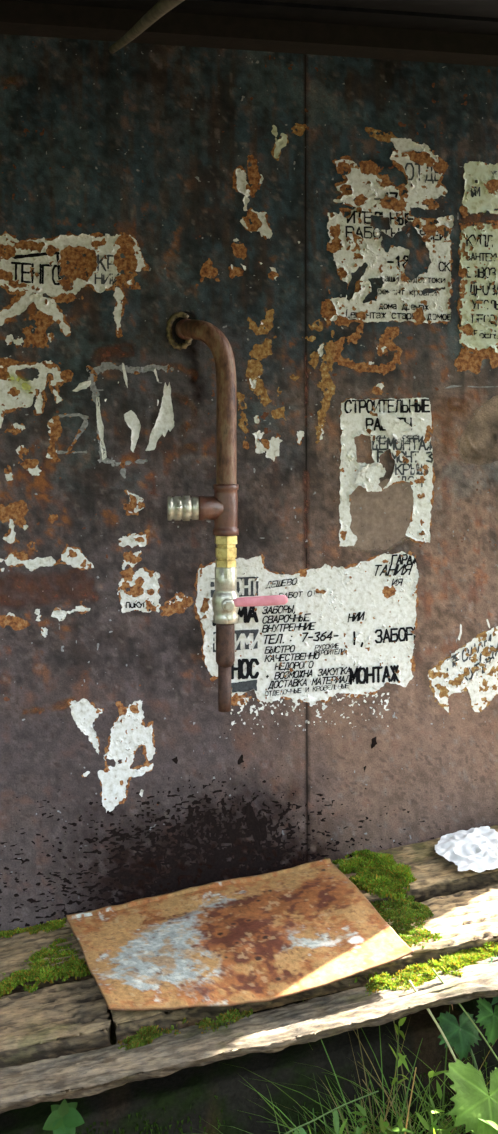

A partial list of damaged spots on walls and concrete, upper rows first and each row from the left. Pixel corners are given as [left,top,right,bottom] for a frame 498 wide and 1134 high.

corrosion [365,113,426,153]
corrosion [5,310,54,348]
peeling [73,362,187,406]
corrosion [237,309,285,440]
corrosion [290,322,417,444]
corrosion [441,348,498,375]
corrosion [34,410,101,463]
peeling [0,413,188,633]
corrosion [159,592,194,616]